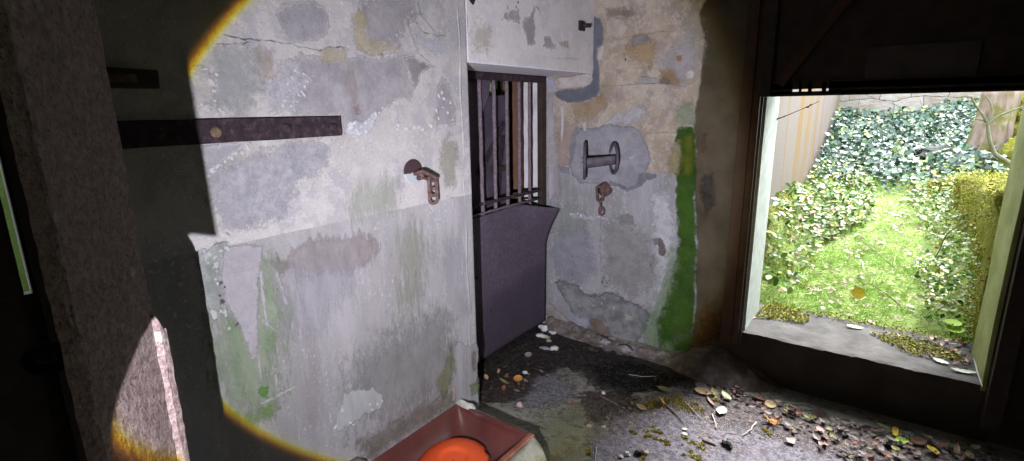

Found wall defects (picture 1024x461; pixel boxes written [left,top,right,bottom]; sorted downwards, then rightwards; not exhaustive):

peeling [199,242,239,331]
leakage [258,233,378,334]
flaking render [546,271,650,341]
leakage [554,190,692,351]
peeling [333,387,383,446]